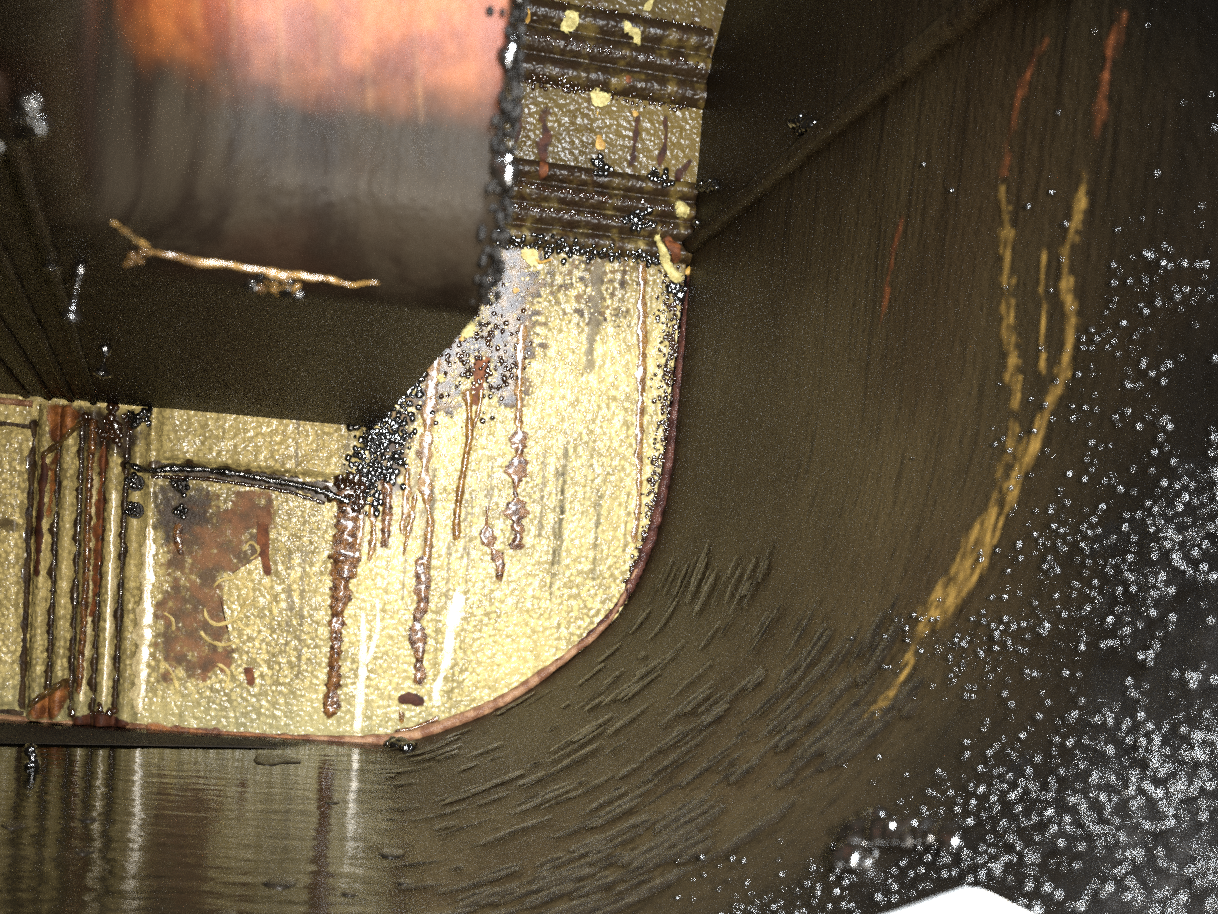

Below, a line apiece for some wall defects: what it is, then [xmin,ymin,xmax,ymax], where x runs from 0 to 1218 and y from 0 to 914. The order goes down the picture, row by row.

corrosion [34,404,85,577]
corrosion [88,442,108,617]
corrosion [154,491,277,689]